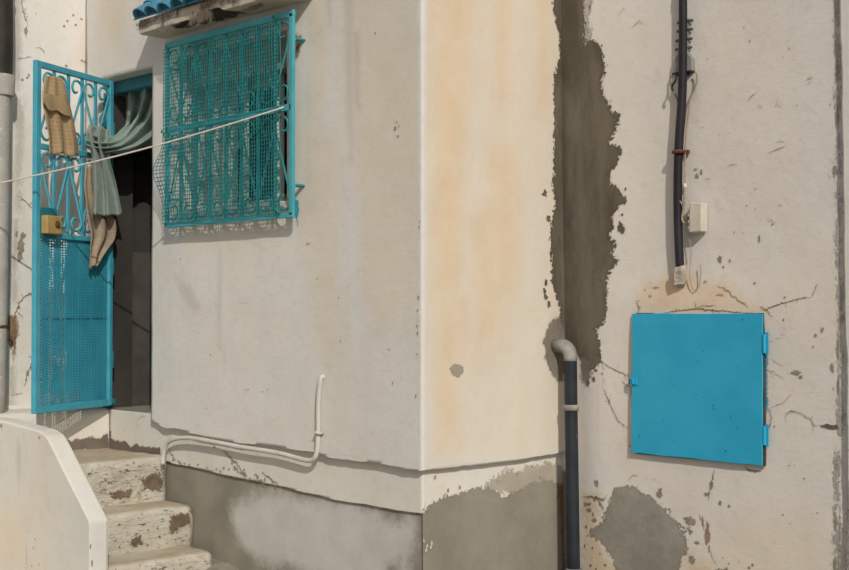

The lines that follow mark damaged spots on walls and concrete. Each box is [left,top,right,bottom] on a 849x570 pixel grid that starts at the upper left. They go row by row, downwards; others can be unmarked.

spalling [172,3,263,29]
peeling [582,0,593,45]
peeling [828,0,847,436]
crack [13,293,32,319]
crack [664,285,817,317]
crack [595,355,631,428]
crack [766,361,838,430]
peeling [99,466,164,499]
peeling [127,513,191,547]
peeling [423,460,564,570]
spalling [584,479,710,570]
peeling [830,451,849,570]